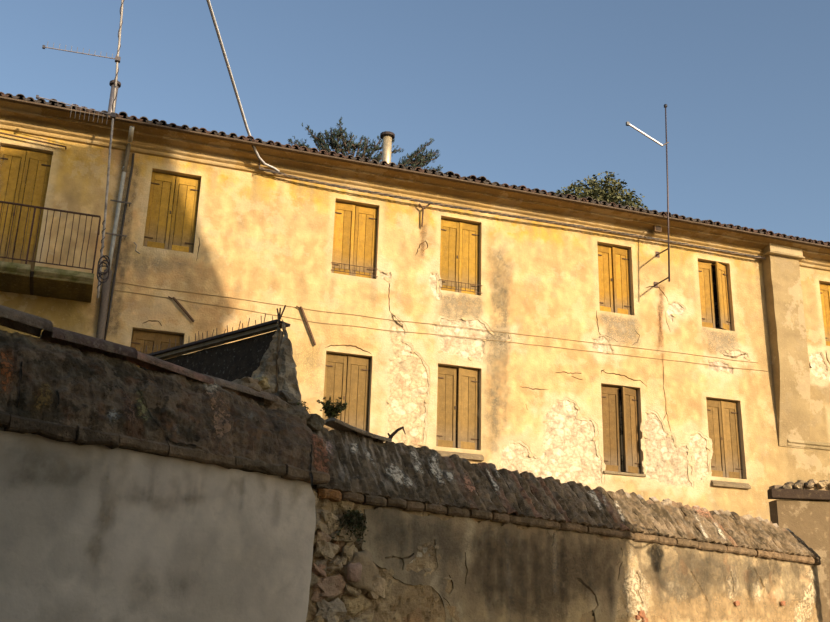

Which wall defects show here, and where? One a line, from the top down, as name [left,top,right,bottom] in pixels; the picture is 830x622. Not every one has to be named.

flaking render [385,311,453,486]
flaking render [432,315,511,363]
crack [601,367,674,440]
flaking render [708,349,750,374]
flaking render [808,352,830,381]
flaking render [487,397,606,510]
flaking render [640,409,713,488]
flaking render [309,511,387,622]
crack [385,554,414,570]
water stain [475,530,607,616]
crack [578,578,598,616]